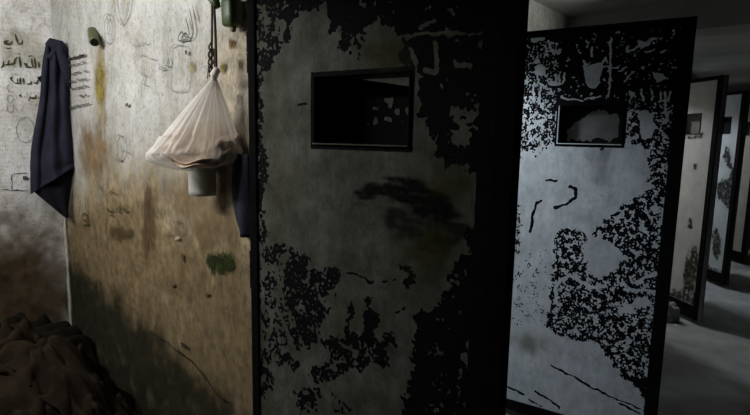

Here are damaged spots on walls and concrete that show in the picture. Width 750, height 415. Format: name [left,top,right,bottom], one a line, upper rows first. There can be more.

rust [98,45,106,91]
leakage [218,27,248,117]
leakage [235,110,249,154]
leakage [66,166,251,305]
peeling [256,0,483,415]
peeling [506,27,681,415]
leakage [0,213,253,415]
crack [150,331,231,403]